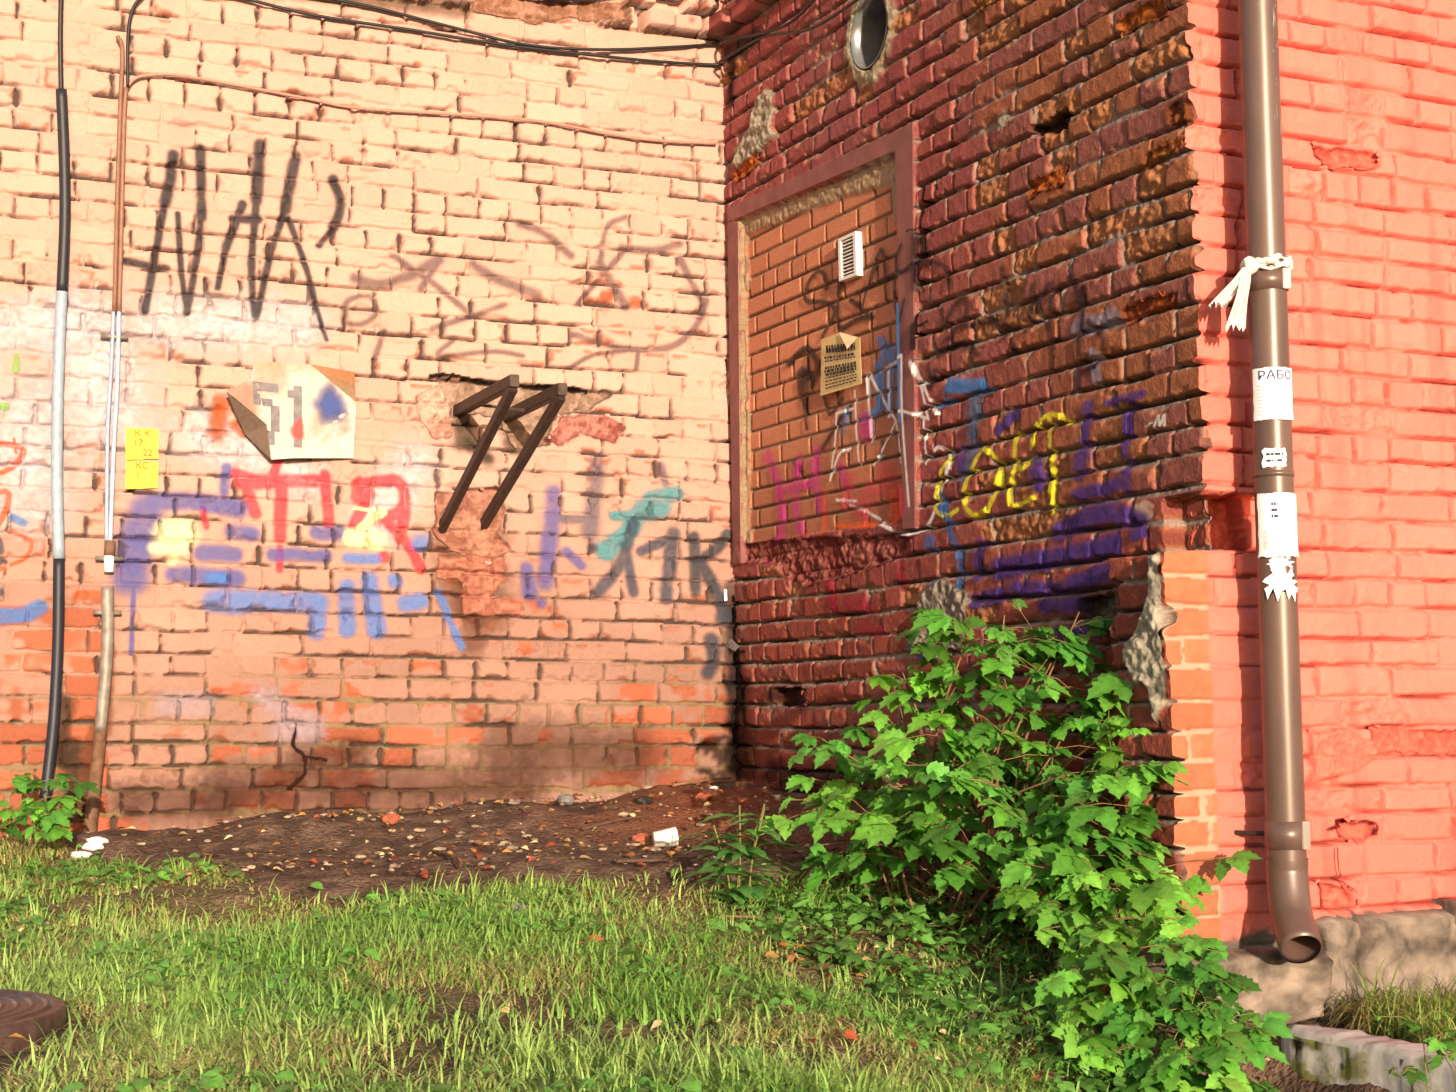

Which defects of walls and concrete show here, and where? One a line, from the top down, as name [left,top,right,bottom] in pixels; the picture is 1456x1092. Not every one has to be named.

spalling [1037,113,1076,136]
spalling [733,152,761,182]
flaking render [416,378,626,449]
spalling [778,687,807,706]
spalling [1367,724,1456,756]
spalling [1315,879,1362,909]